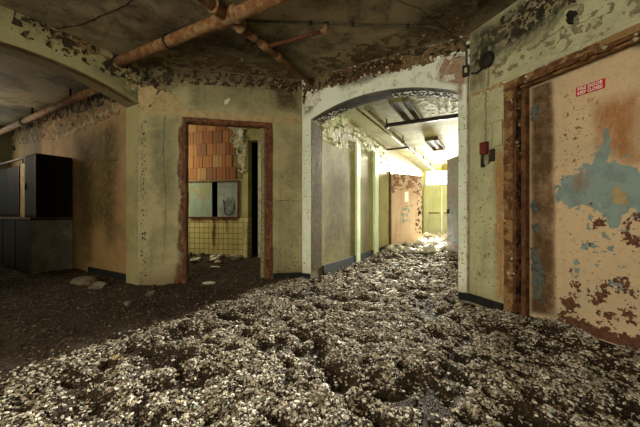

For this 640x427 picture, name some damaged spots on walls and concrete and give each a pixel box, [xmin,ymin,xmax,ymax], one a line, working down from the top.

crack [55,0,174,30]
peeling [622,0,640,18]
peeling [11,93,120,151]
rust [175,117,273,284]
peeling [275,108,389,273]
peeling [123,0,617,240]
rust [496,41,613,314]
peeling [552,90,640,303]